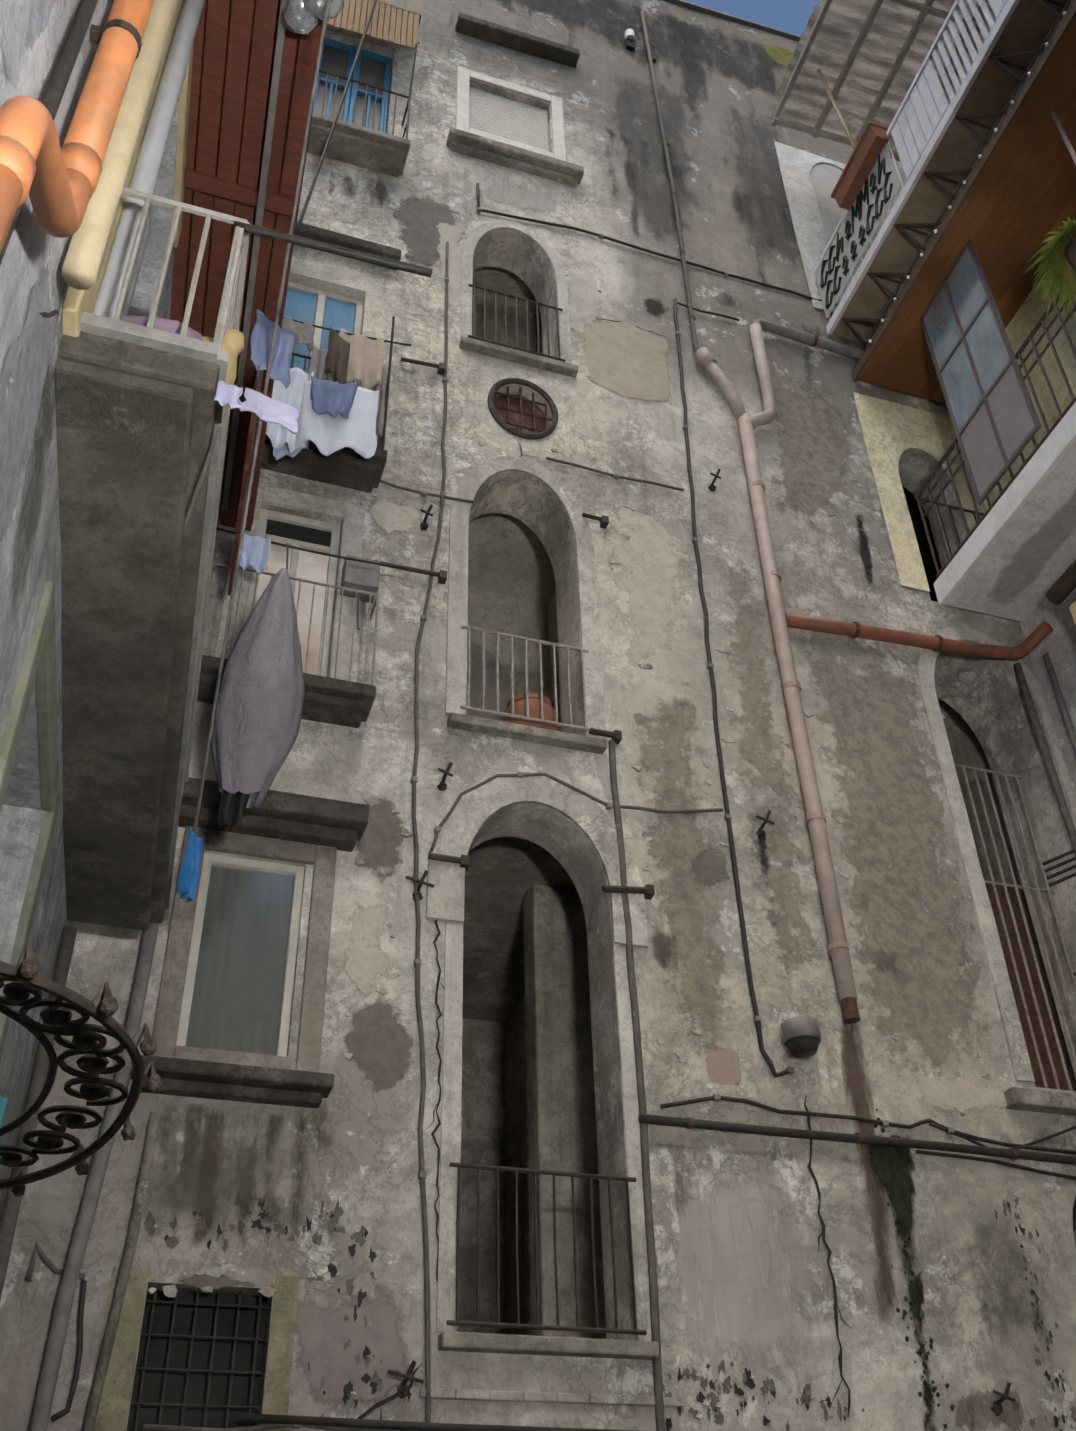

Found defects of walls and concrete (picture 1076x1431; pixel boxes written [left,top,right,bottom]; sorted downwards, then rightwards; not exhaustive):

water stain [500,0,780,237]
water stain [733,109,794,254]
water stain [186,1108,222,1240]
rust [842,1024,894,1316]
flaking render [143,1192,412,1417]
flaking render [663,1360,790,1431]
flaking render [796,1383,864,1421]
flaking render [995,1197,1076,1431]